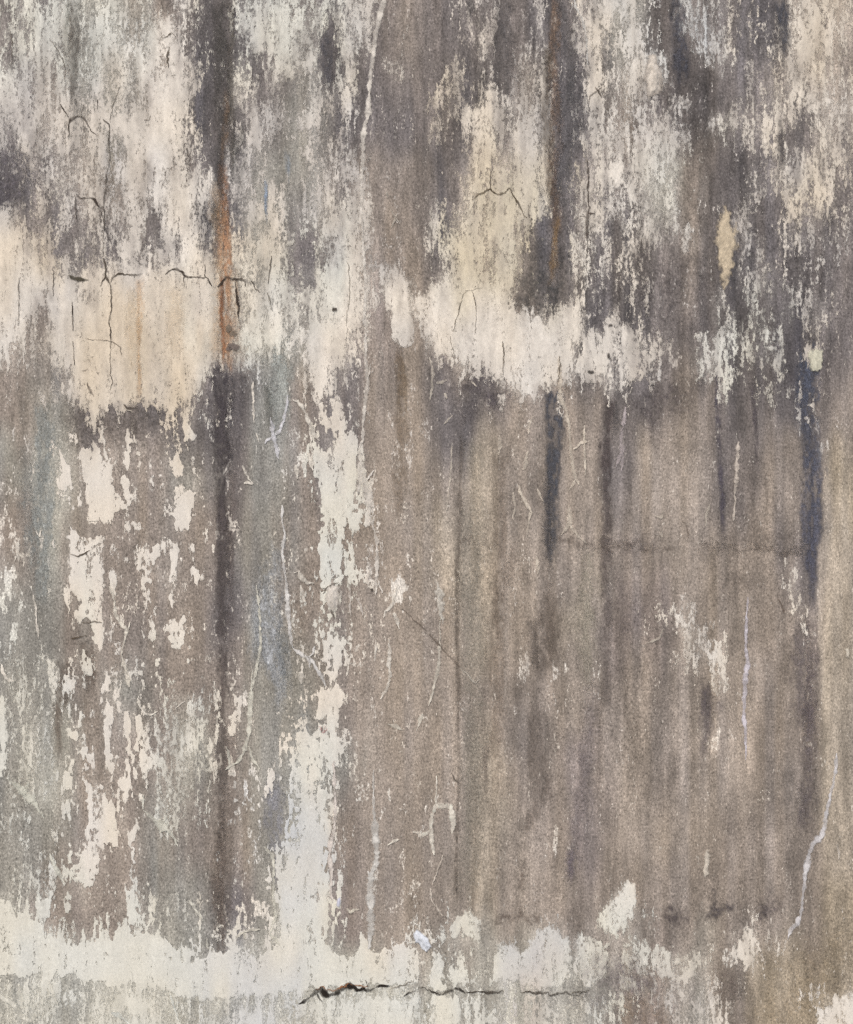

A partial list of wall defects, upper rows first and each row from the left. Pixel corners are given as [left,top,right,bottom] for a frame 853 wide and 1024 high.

crack [52,89,137,411]
crack [165,256,273,321]
corrosion [217,181,232,358]
crack [475,172,527,218]
peeling [123,429,140,470]
peeling [163,485,196,532]
damp [210,368,232,742]
damp [545,392,563,554]
damp [797,357,822,592]
peeling [0,640,95,845]
peeling [61,524,242,889]
crack [299,980,590,1004]